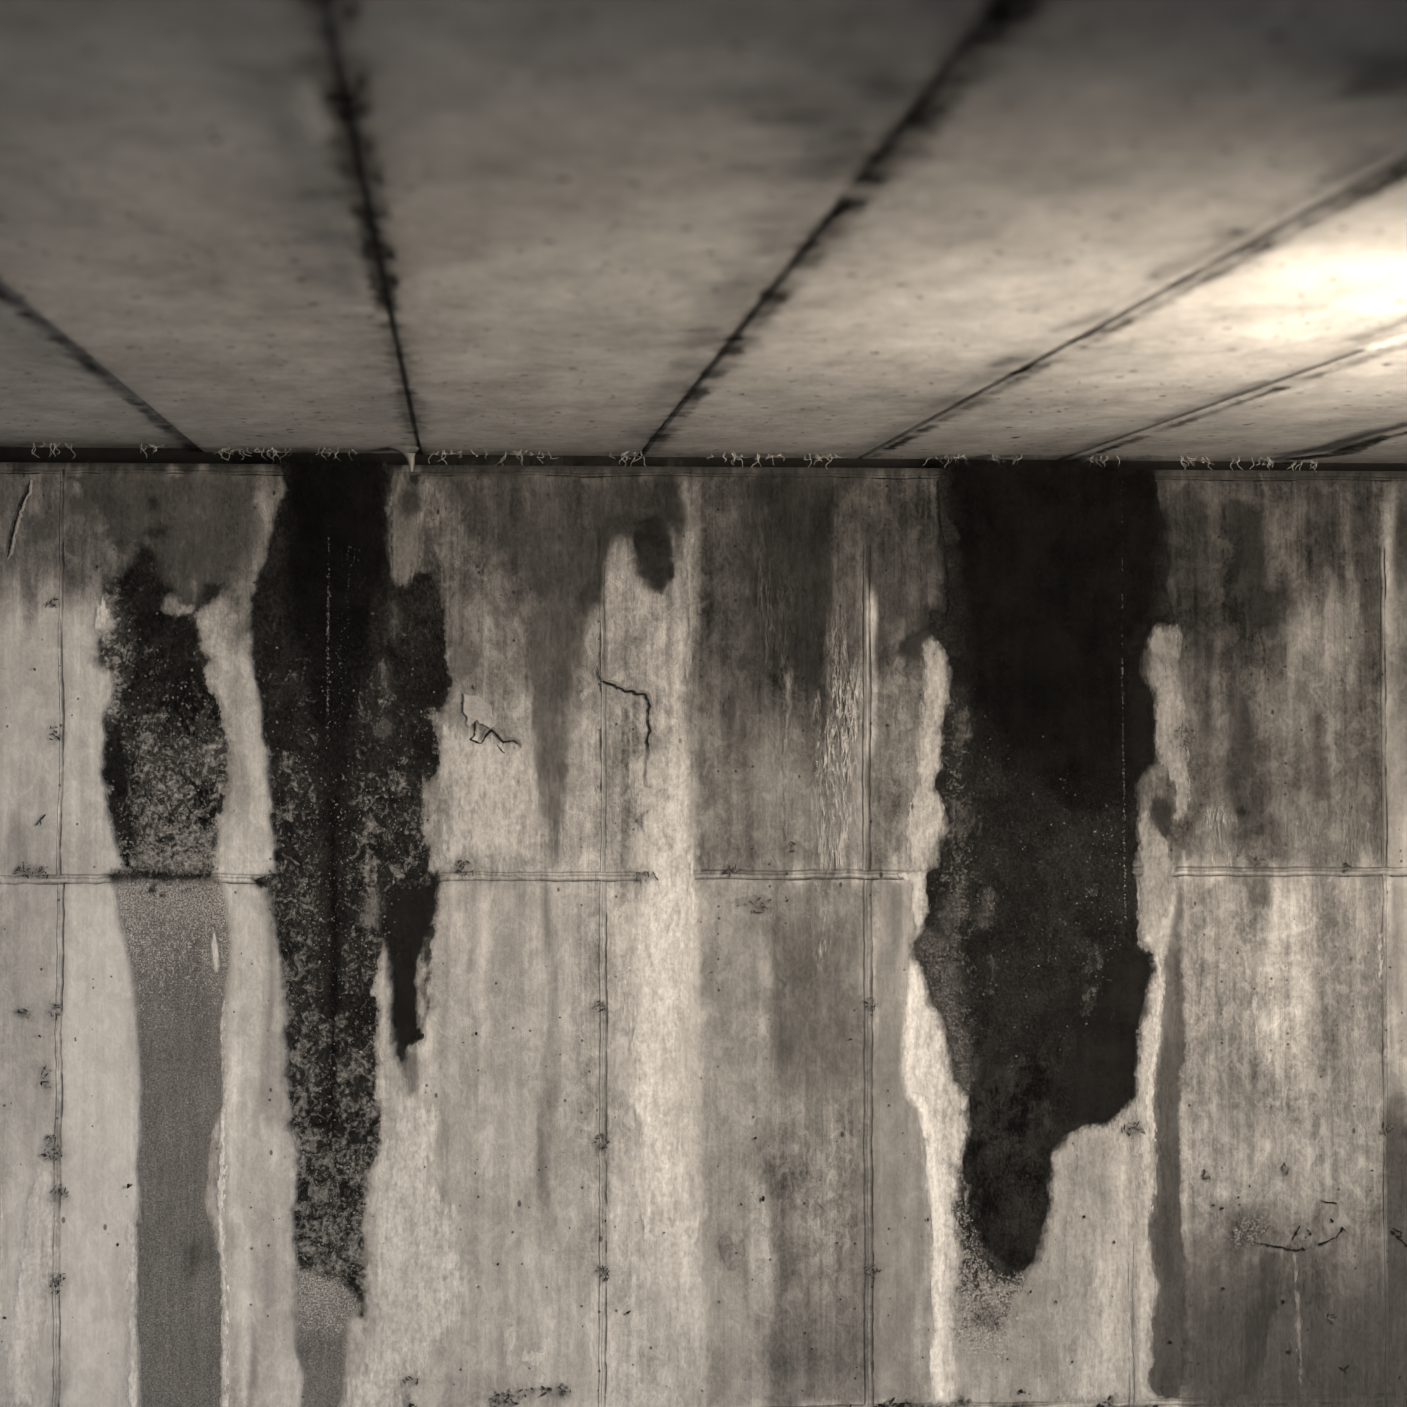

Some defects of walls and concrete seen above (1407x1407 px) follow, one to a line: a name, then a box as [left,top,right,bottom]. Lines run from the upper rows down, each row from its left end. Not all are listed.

damp [1230,372,1328,405]
damp [1168,418,1203,427]
peeling [462,693,496,729]
crack [596,666,665,850]
damp [251,459,529,1407]
damp [898,437,1407,1407]
damp [95,525,231,1407]
crack [1254,1200,1347,1252]
crack [1390,1228,1407,1247]